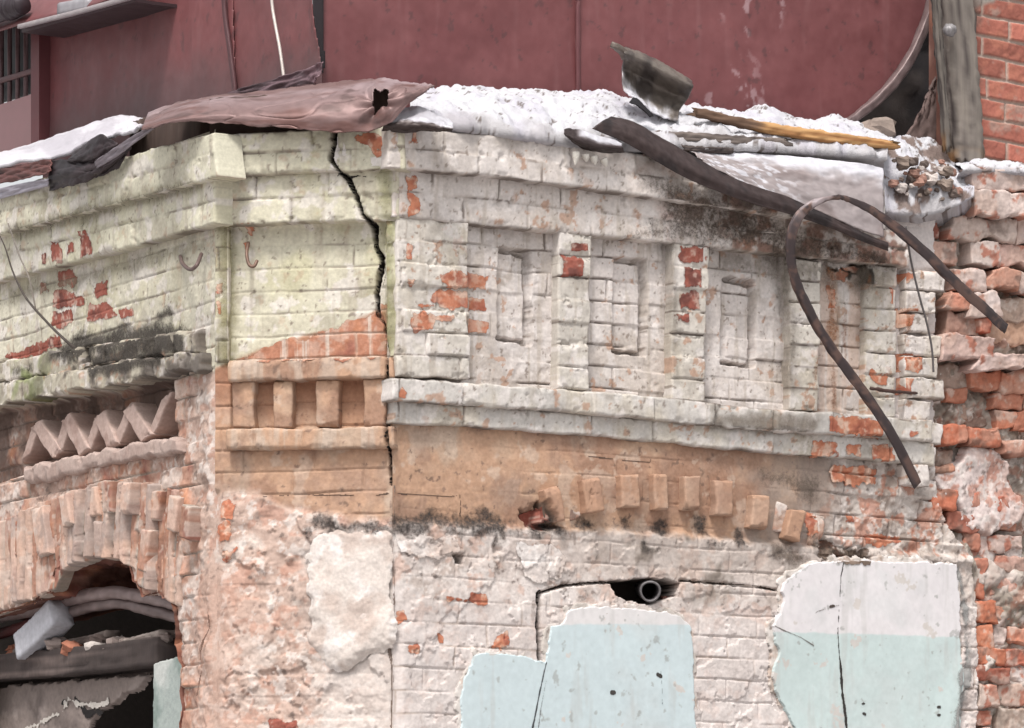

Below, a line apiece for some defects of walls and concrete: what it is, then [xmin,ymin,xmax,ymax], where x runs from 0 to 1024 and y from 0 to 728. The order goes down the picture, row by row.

peeling [406,175,421,217]
crack [331,133,389,376]
peeling [5,229,134,359]
water stain [51,306,183,377]
peeling [239,304,388,363]
peeling [410,270,489,334]
peeling [809,415,895,488]
spalling [518,507,549,531]
crack [775,562,848,728]
peeling [25,697,109,728]